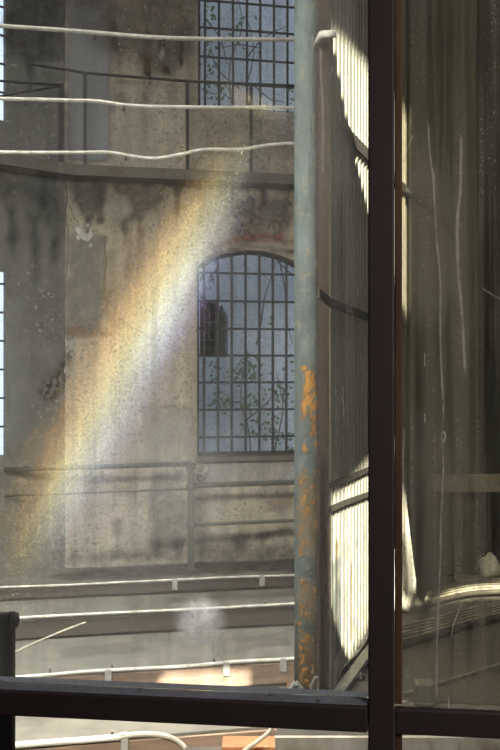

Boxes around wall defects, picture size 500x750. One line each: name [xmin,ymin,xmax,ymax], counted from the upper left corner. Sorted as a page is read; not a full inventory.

damp [74,548,294,580]
rust [297,470,339,689]